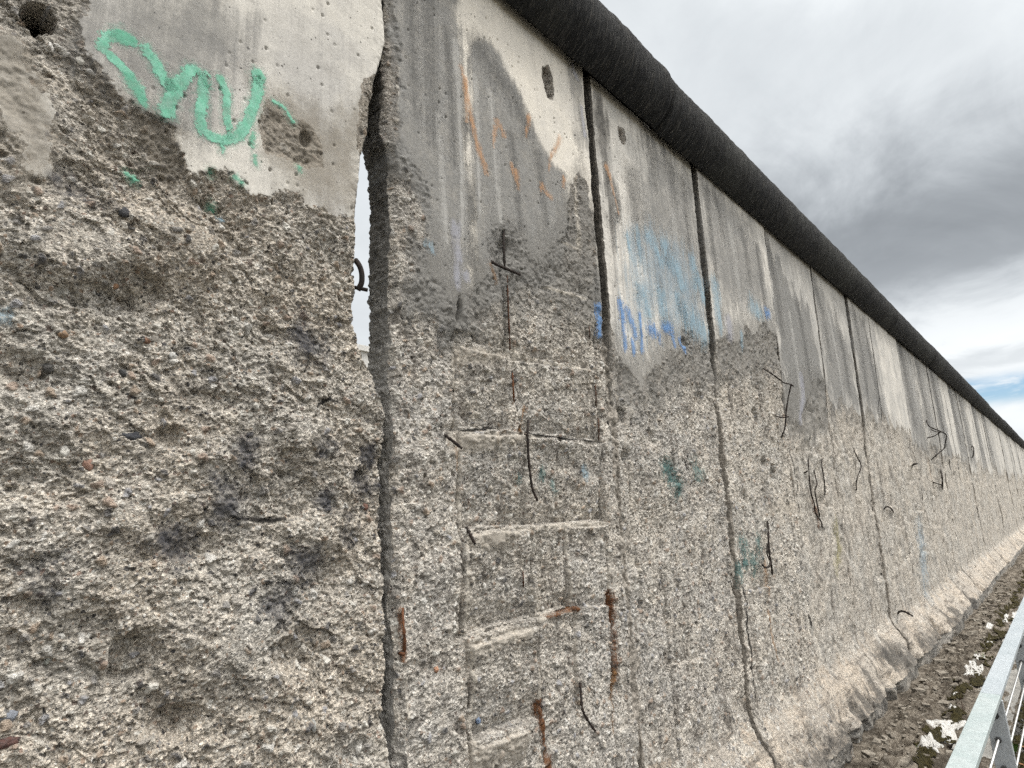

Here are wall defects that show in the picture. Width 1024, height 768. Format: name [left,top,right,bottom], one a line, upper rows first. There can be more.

spalling [0,0,639,768]
spalling [610,321,1024,768]
rust [605,590,619,681]
crack [742,587,756,702]
rust [533,699,552,768]